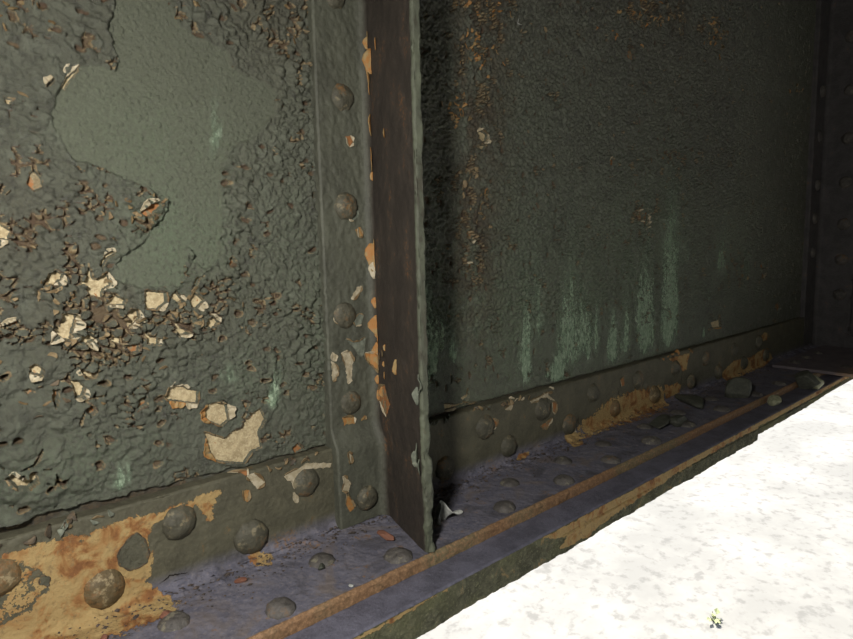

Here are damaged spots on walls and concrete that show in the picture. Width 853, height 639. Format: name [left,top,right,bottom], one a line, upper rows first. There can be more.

peeling [61,63,79,89]
peeling [362,37,376,95]
peeling [0,223,11,248]
peeling [99,193,168,224]
peeling [349,210,375,279]
peeling [37,248,222,369]
peeling [331,297,397,417]
peeling [25,364,106,419]
peeling [411,374,422,405]
rust [543,376,849,549]
peeling [342,475,356,512]
rust [0,490,225,639]